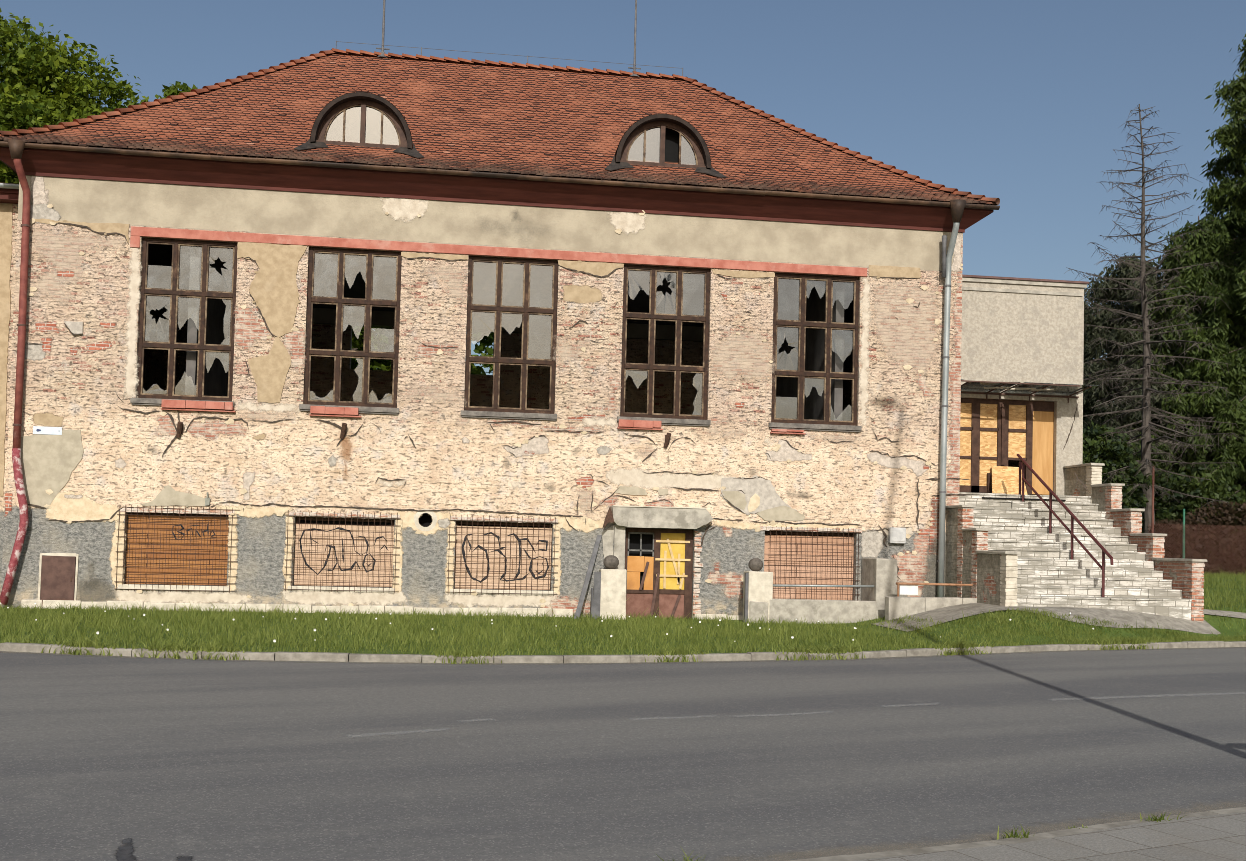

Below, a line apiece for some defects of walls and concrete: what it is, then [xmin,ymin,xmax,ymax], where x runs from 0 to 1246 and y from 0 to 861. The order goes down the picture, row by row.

crack [246,257,277,337]
peeling [401,252,468,260]
spalling [558,260,624,304]
crack [559,265,623,343]
peeling [712,269,775,278]
peeling [0,203,130,524]
flaking render [414,341,462,359]
flaking render [713,332,773,382]
crack [117,395,416,456]
spalling [486,377,621,457]
spalling [867,452,932,476]
crack [211,421,969,580]